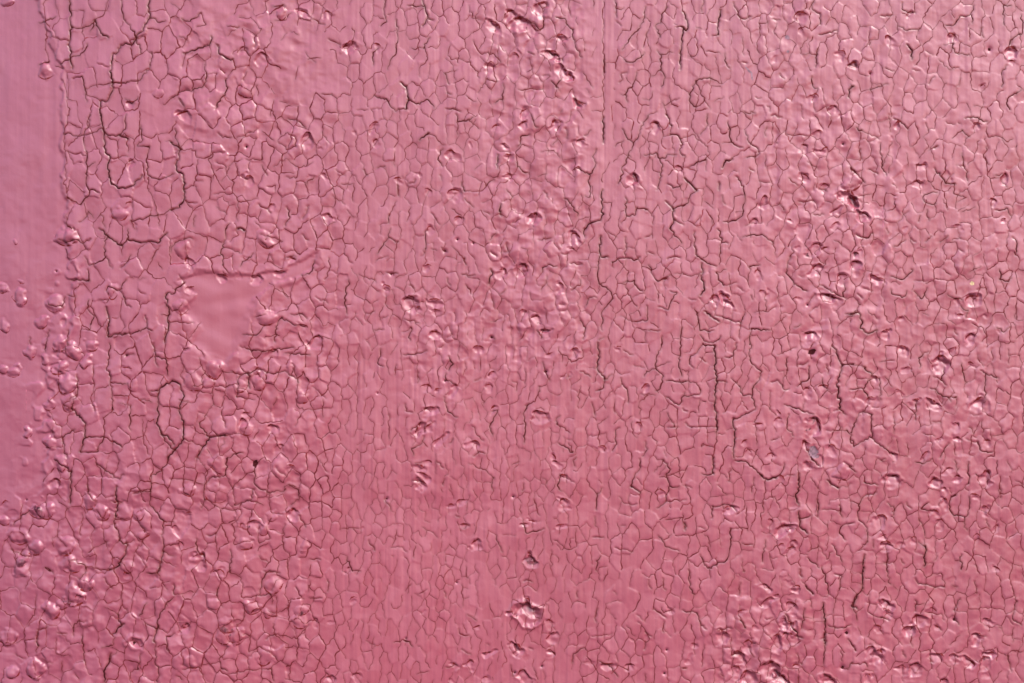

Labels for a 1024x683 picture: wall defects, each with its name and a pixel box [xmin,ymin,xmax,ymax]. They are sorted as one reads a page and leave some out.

crack [297,0,325,31]
crack [373,0,515,92]
peeling [175,248,323,367]
crack [265,317,295,341]
crack [480,271,537,339]
crack [541,334,584,369]
crack [727,255,758,297]
crack [382,498,442,598]
crack [395,524,489,683]
crack [488,541,561,656]
crack [564,594,656,683]
crack [964,628,1024,683]